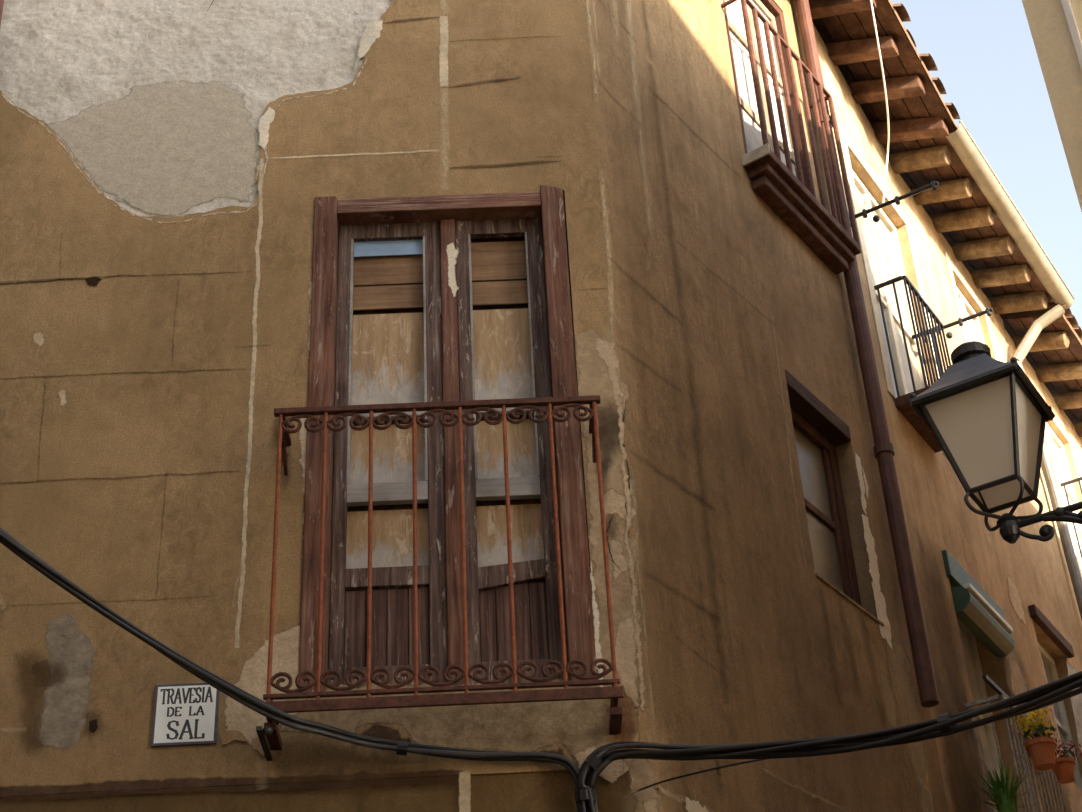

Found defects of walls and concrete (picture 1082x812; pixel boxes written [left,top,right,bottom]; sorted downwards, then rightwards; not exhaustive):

peeling [0,0,392,224]
peeling [575,331,652,716]
peeling [855,452,892,649]
peeling [574,746,597,768]
peeling [599,750,714,812]